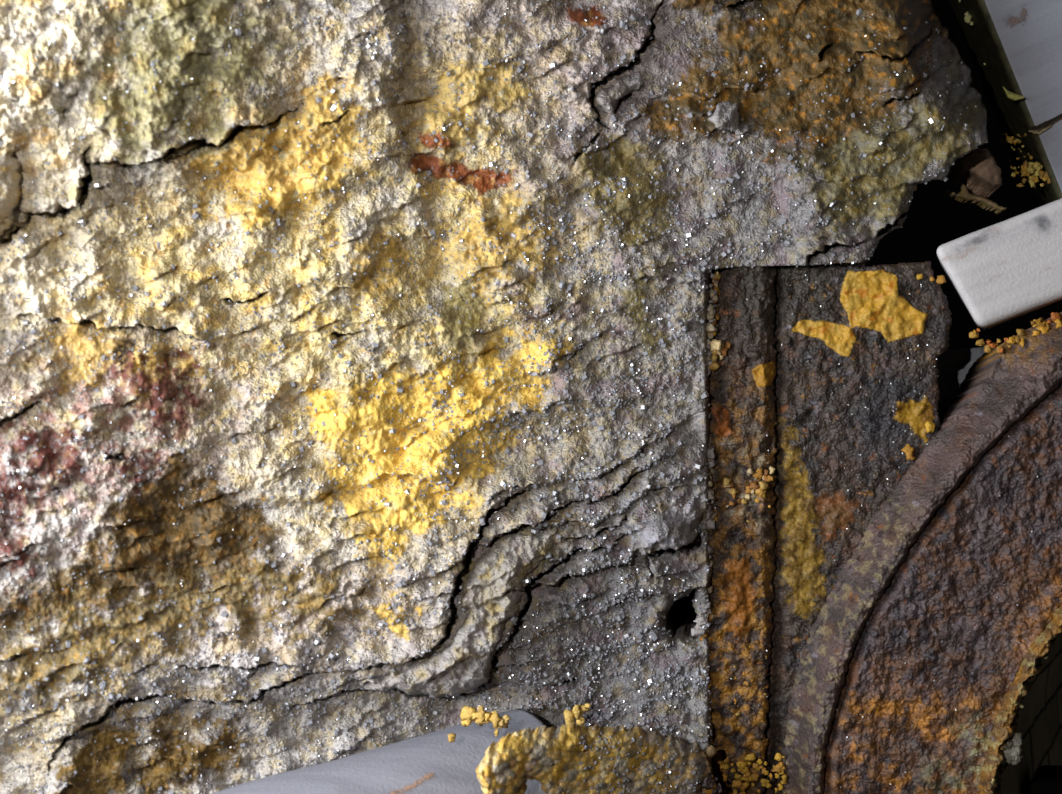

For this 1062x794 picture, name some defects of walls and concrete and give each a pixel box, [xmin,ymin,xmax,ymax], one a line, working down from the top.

rust [567,5,607,27]
crack [574,0,663,164]
rust [641,0,955,166]
crack [19,125,242,223]
rust [408,132,516,196]
rust [752,361,776,387]
rust [894,398,935,443]
crack [105,453,126,461]
peeling [722,466,775,508]
crack [389,466,652,699]
spalling [671,589,697,615]
crack [181,657,415,712]